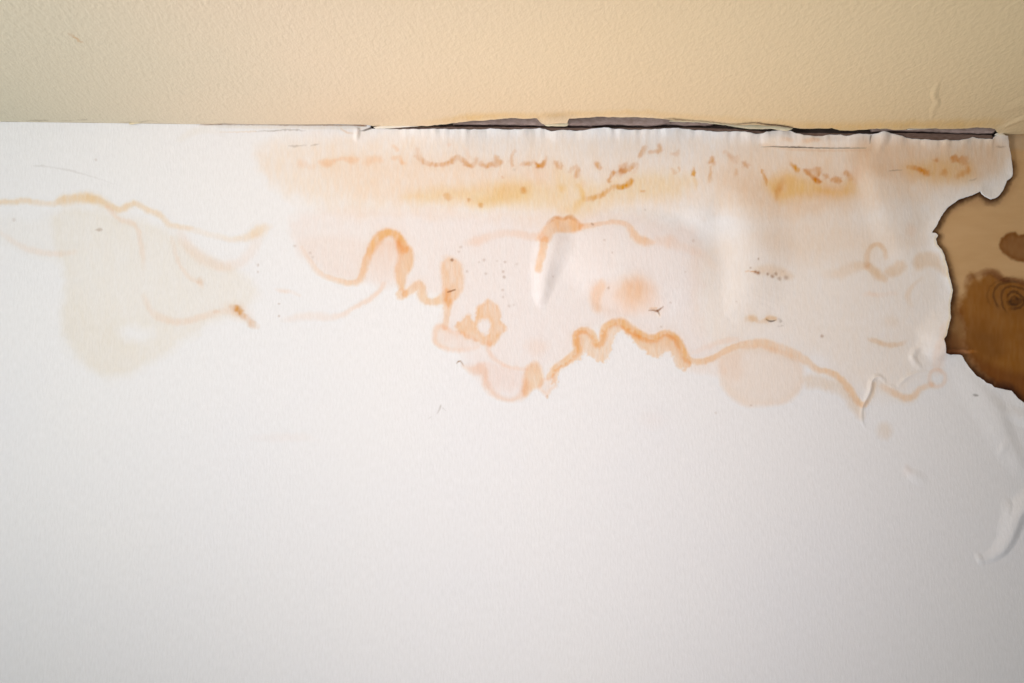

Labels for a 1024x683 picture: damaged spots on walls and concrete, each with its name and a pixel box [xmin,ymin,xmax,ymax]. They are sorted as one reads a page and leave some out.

leakage [0,107,1013,443]
peeling [932,134,1024,402]